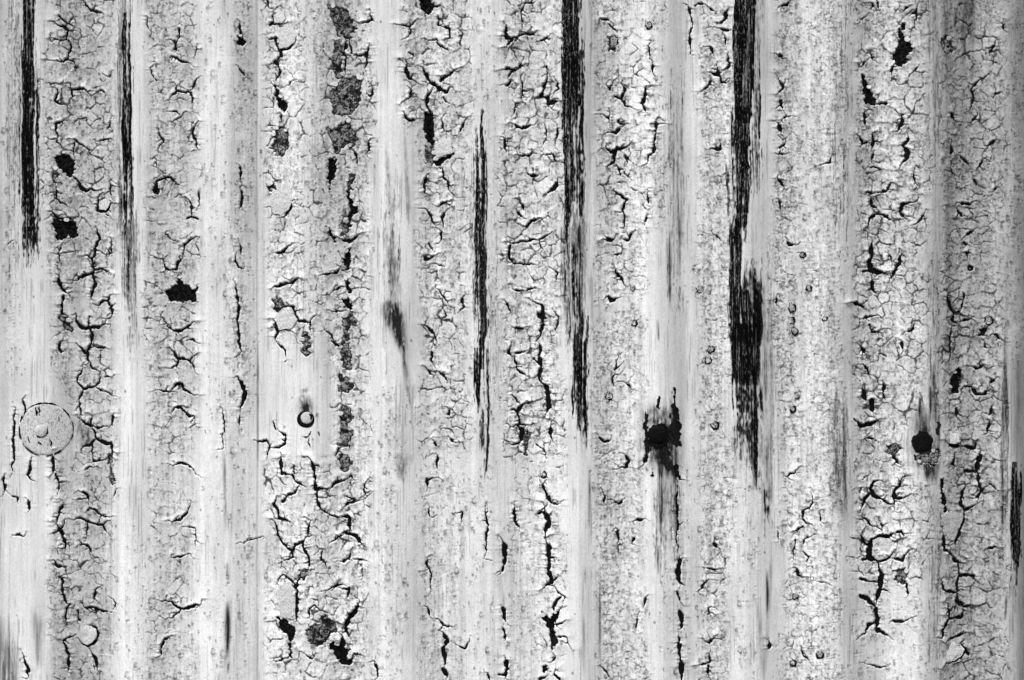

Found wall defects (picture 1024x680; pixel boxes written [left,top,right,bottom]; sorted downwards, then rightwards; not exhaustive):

crack [2,0,117,673]
peeling [50,151,76,187]
peeling [52,218,80,242]
peeling [165,275,198,304]
crack [218,243,379,678]
peeling [323,4,363,472]
crack [421,0,570,680]
crack [601,44,665,302]
rust [646,407,677,526]
crack [851,112,925,638]
rust [914,371,940,480]
peeling [276,569,351,665]